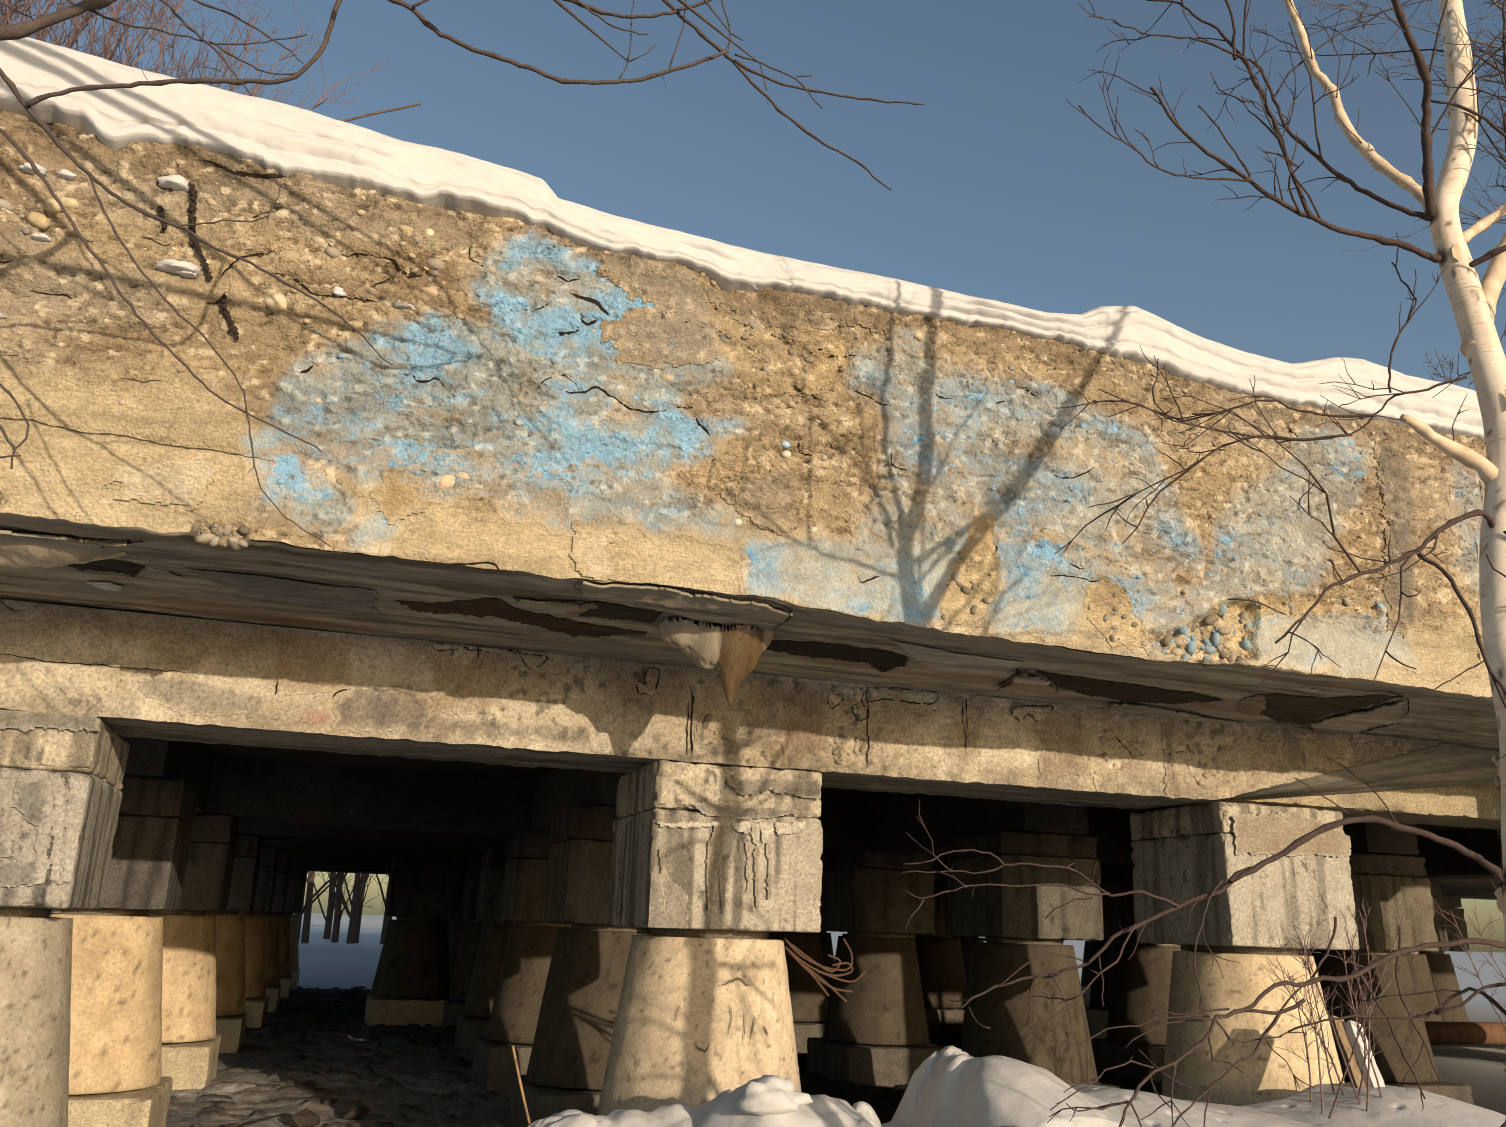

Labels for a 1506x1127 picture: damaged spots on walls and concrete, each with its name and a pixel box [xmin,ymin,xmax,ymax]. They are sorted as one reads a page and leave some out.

spalling [0,196,94,244]
spalling [162,157,238,226]
crack [524,275,610,336]
crack [413,375,445,387]
crack [537,374,710,436]
peeling [190,224,1433,769]
damp [695,679,830,759]
spalling [998,669,1239,791]
damp [648,778,821,929]